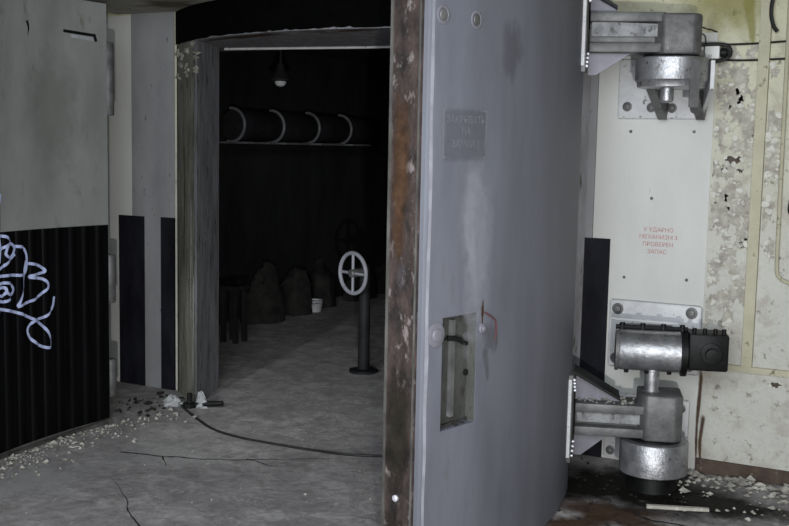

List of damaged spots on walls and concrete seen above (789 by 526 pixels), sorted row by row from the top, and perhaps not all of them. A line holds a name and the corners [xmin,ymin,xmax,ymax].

rust [393,105,408,256]
crack [122,452,225,466]
rust [386,381,407,497]
crack [110,477,140,526]
rust [547,499,659,526]